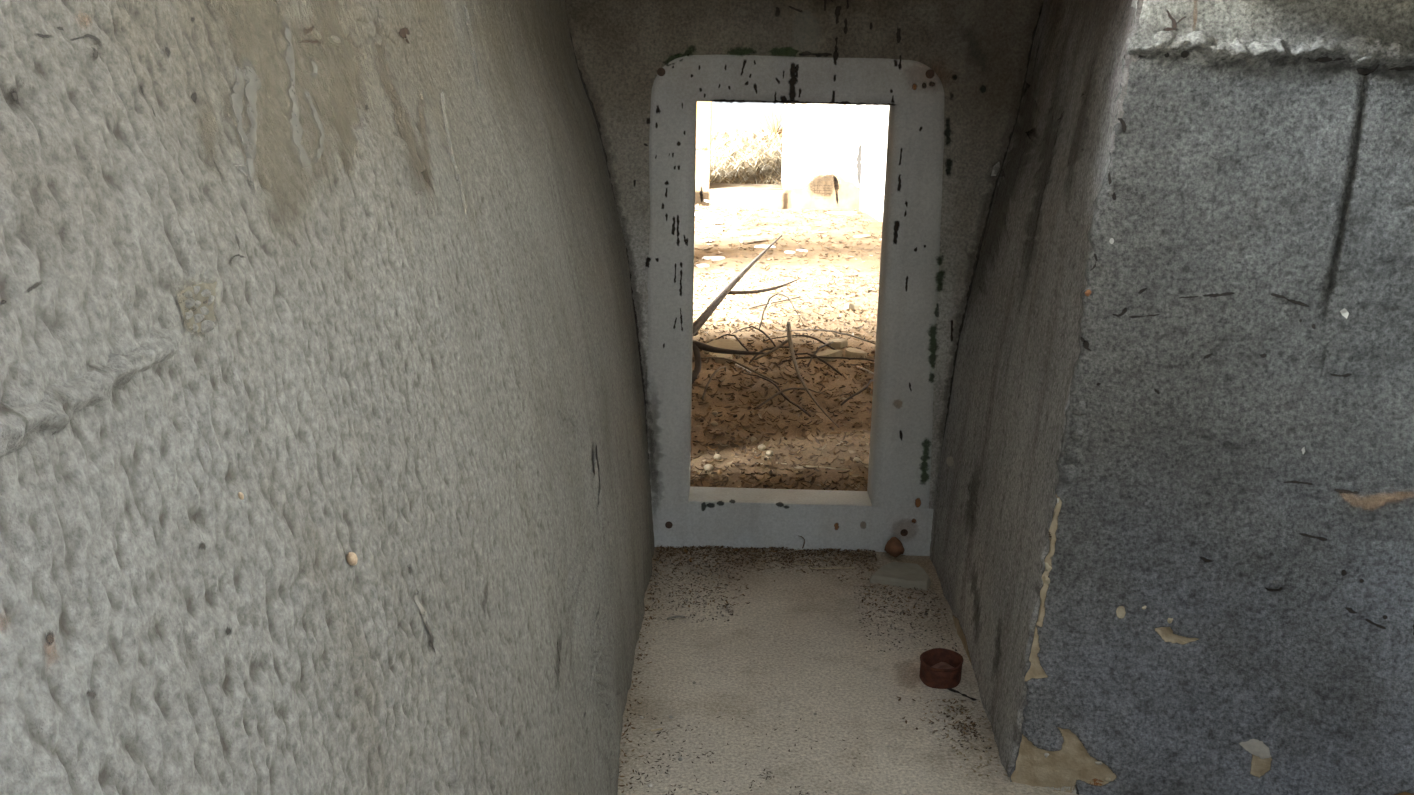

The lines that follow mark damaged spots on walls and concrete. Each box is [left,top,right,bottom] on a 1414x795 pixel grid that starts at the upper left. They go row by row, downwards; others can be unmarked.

damp [201,0,359,215]
spalling [1025,401,1087,682]
spalling [1155,618,1199,645]
spalling [1011,727,1116,795]
peeling [1239,739,1272,778]